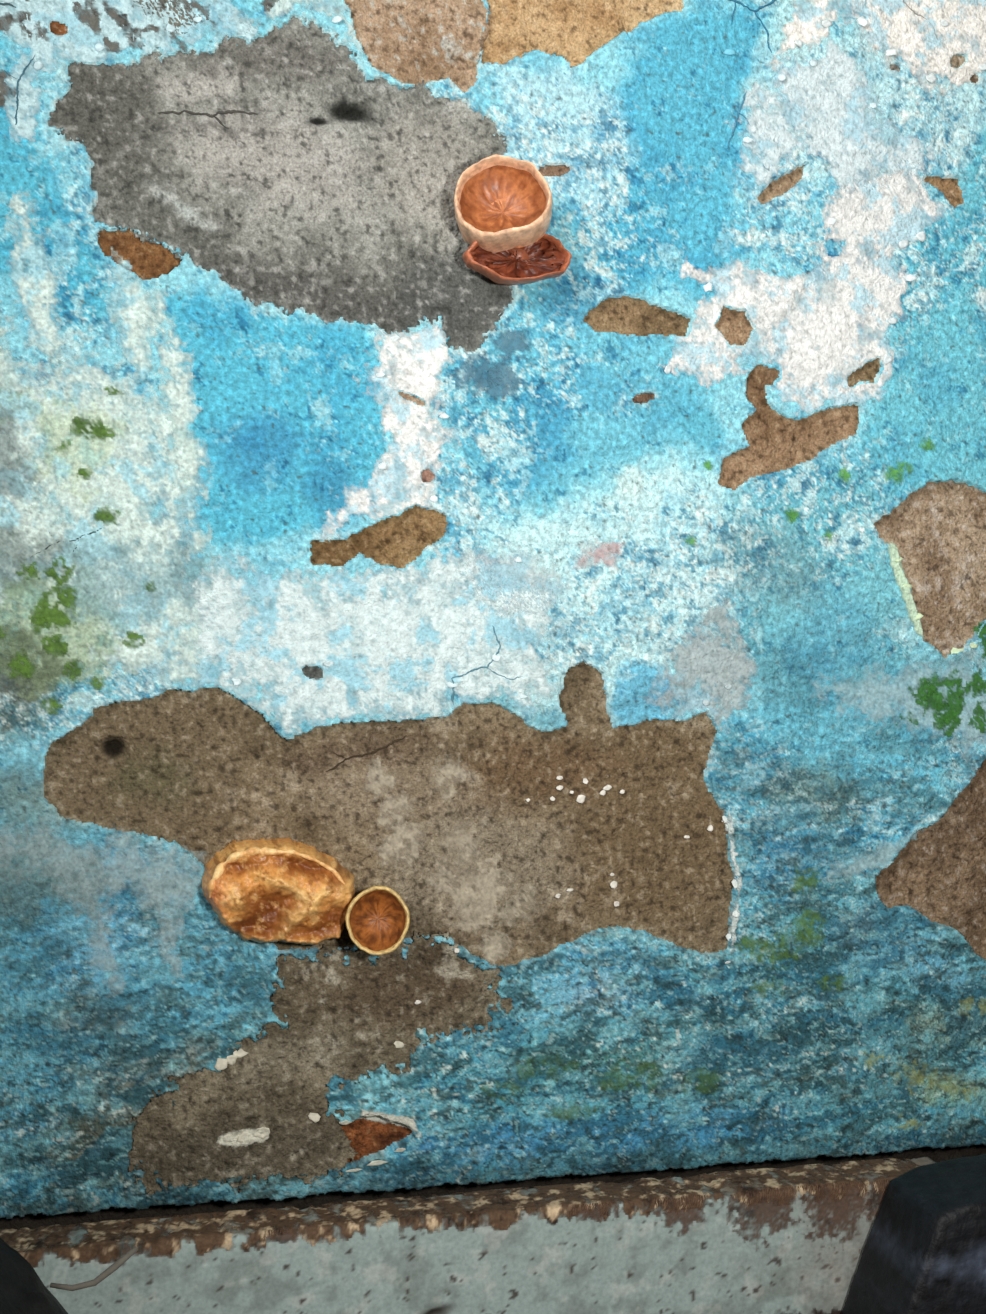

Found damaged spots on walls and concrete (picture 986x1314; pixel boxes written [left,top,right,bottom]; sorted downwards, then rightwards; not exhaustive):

peeling [0,0,259,141]
flaking render [266,0,684,93]
flaking render [97,228,182,280]
peeling [583,0,986,490]
leakage [0,195,212,682]
flaking render [873,480,986,658]
flaking render [43,326,756,1195]
leakage [834,664,986,761]
leakage [829,833,916,875]
flaking render [876,758,986,959]
rust [0,1158,920,1268]